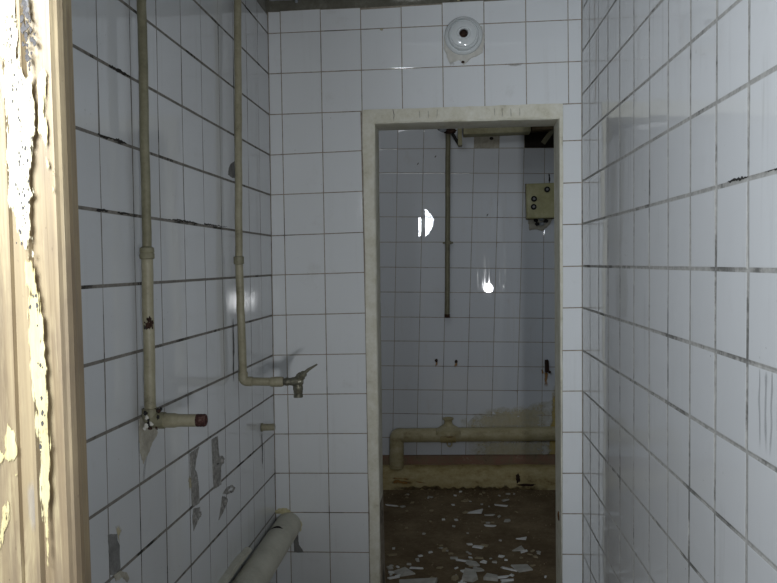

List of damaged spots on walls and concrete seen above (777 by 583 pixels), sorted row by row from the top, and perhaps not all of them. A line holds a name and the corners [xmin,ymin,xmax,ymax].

peeling [0,0,51,566]
spalling [190,447,202,531]
spalling [212,436,235,519]